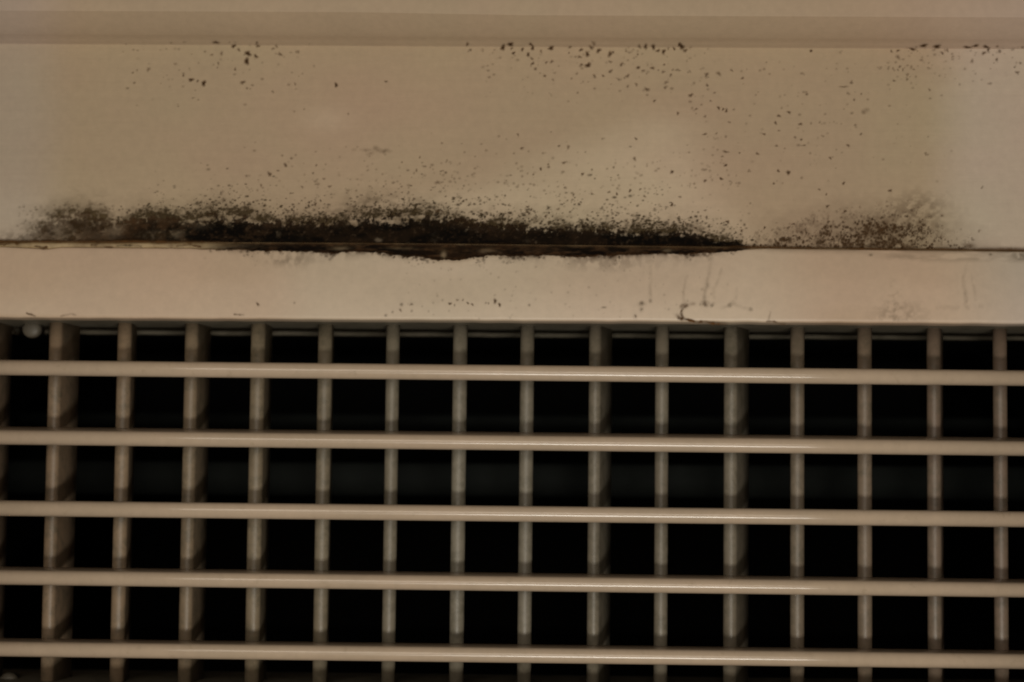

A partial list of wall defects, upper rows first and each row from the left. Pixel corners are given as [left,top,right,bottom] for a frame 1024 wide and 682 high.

leakage [39,192,970,261]